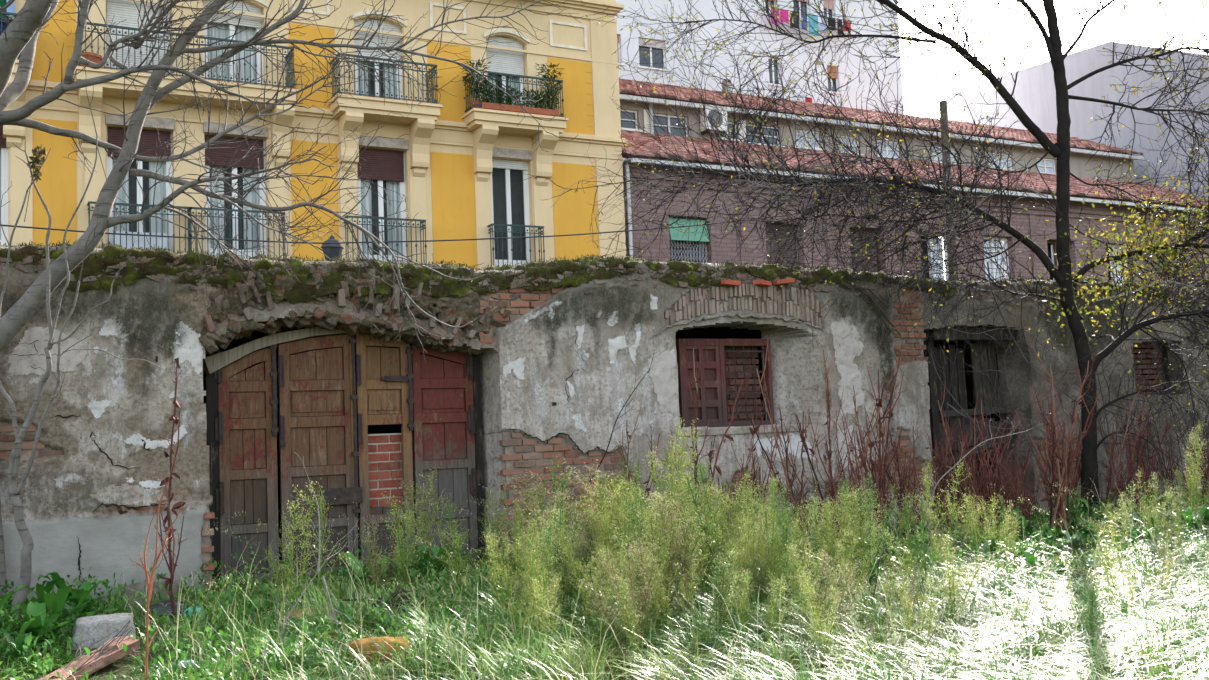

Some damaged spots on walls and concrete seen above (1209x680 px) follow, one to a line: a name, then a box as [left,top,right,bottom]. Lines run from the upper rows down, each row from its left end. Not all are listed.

peeling [7,318,129,379]
spalling [155,269,570,375]
peeling [576,309,678,415]
flaking render [650,284,865,471]
flaking render [892,287,928,367]
flaking render [0,420,64,468]
crack [54,415,150,470]
peeling [124,423,188,449]
flaking render [499,413,641,541]
flaking render [876,429,930,494]